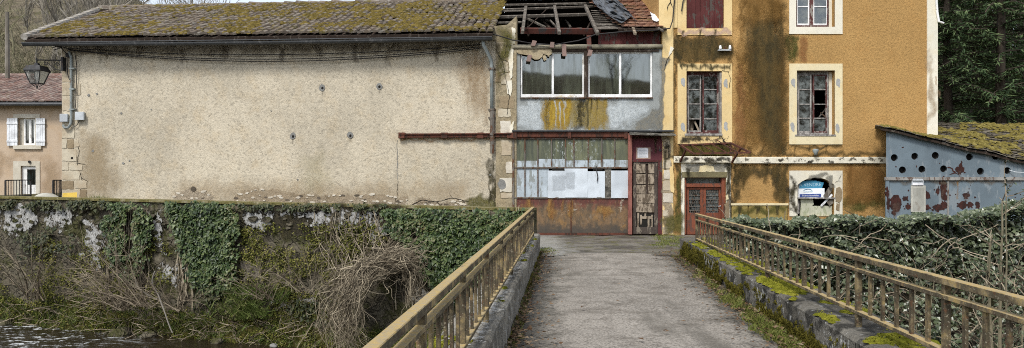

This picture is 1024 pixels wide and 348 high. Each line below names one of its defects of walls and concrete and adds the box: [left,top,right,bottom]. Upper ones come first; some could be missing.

leakage [528,99,606,128]
leakage [654,0,807,218]
corrosion [885,187,911,215]
leakage [242,203,404,239]